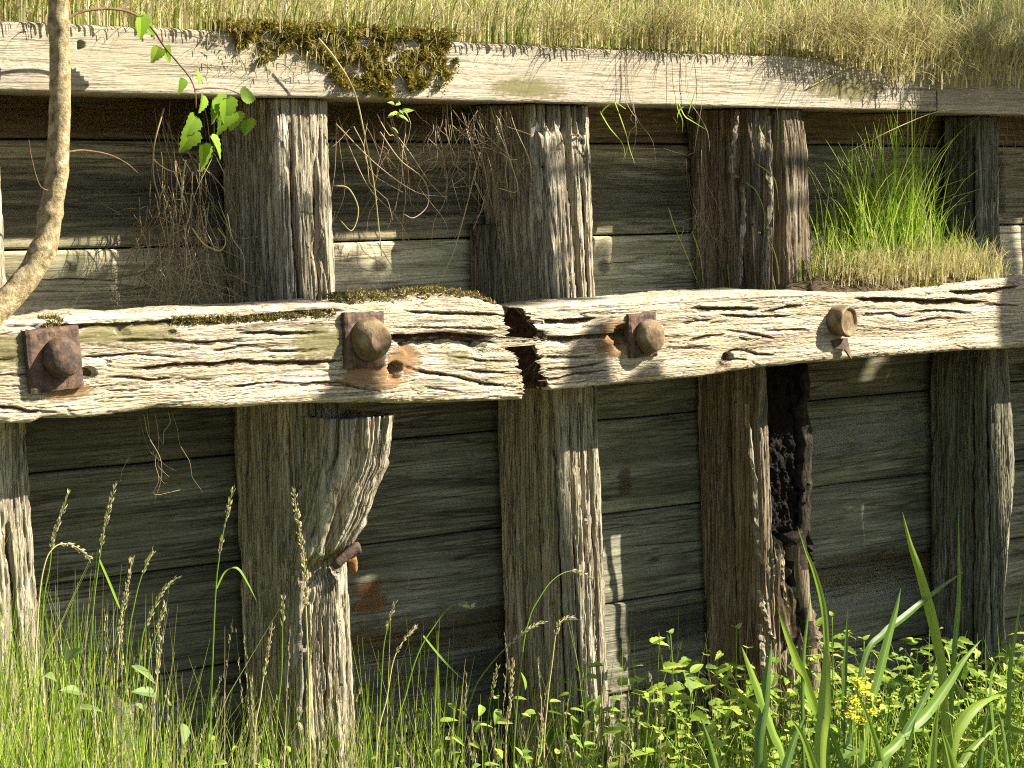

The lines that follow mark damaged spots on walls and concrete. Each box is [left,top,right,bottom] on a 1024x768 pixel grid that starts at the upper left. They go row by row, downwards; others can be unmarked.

crack [35,124,376,391]
crack [391,118,625,403]
crack [665,250,809,360]
crack [854,286,1018,331]
corrosion [596,319,627,357]
corrosion [339,344,420,390]
corrosion [48,385,91,399]
corrosion [347,556,358,573]
crack [535,428,600,762]